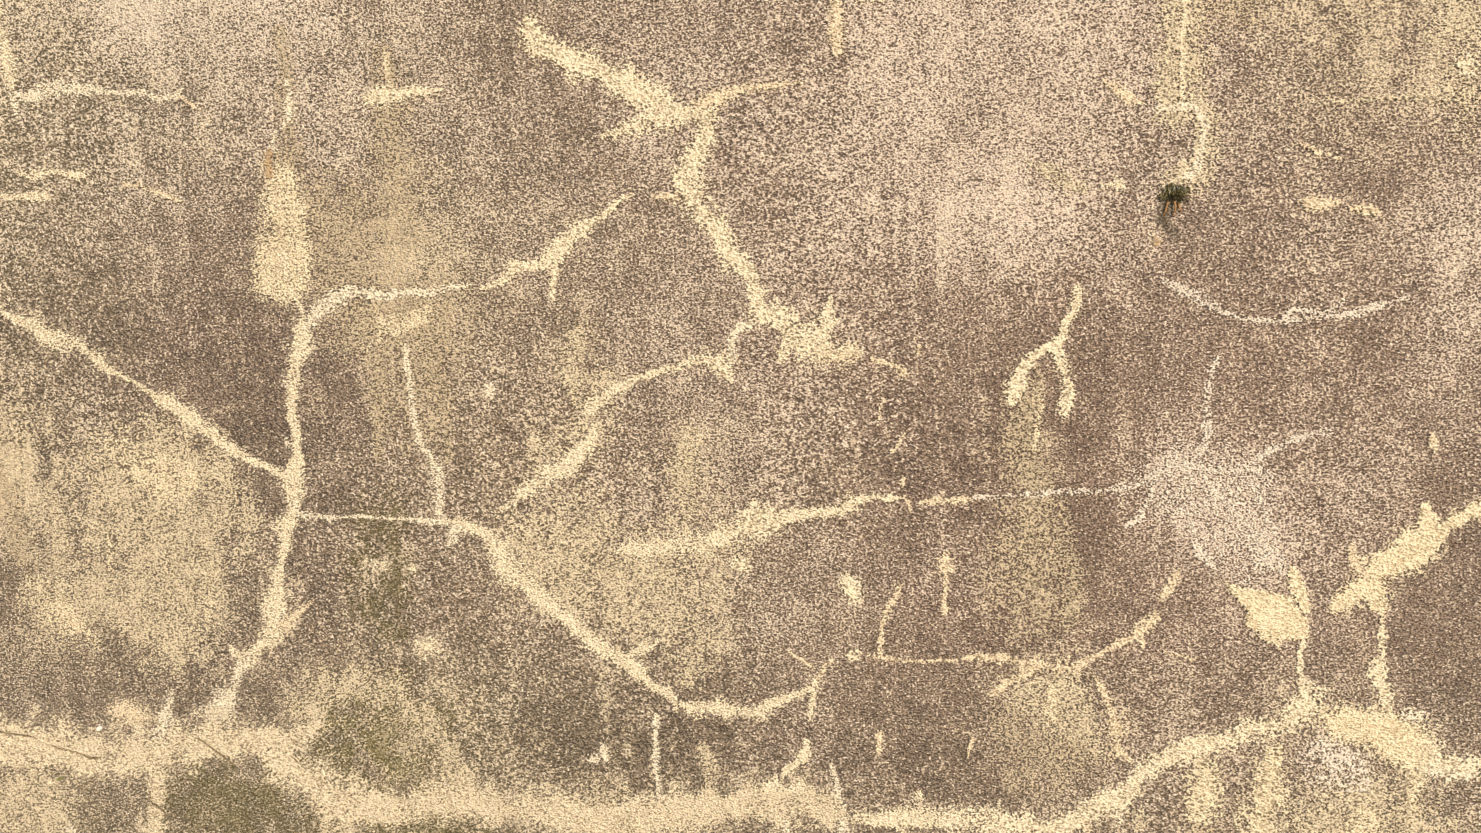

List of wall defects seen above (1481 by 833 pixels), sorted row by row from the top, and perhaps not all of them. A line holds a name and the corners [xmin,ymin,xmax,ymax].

crack [0,0,201,118]
crack [264,79,298,178]
crack [361,84,443,109]
crack [825,0,884,57]
crack [1021,0,1226,210]
crack [1314,51,1481,111]
crack [0,166,86,205]
crack [122,181,182,203]
crack [499,13,910,512]
crack [0,193,1332,833]
crack [1329,498,1481,790]